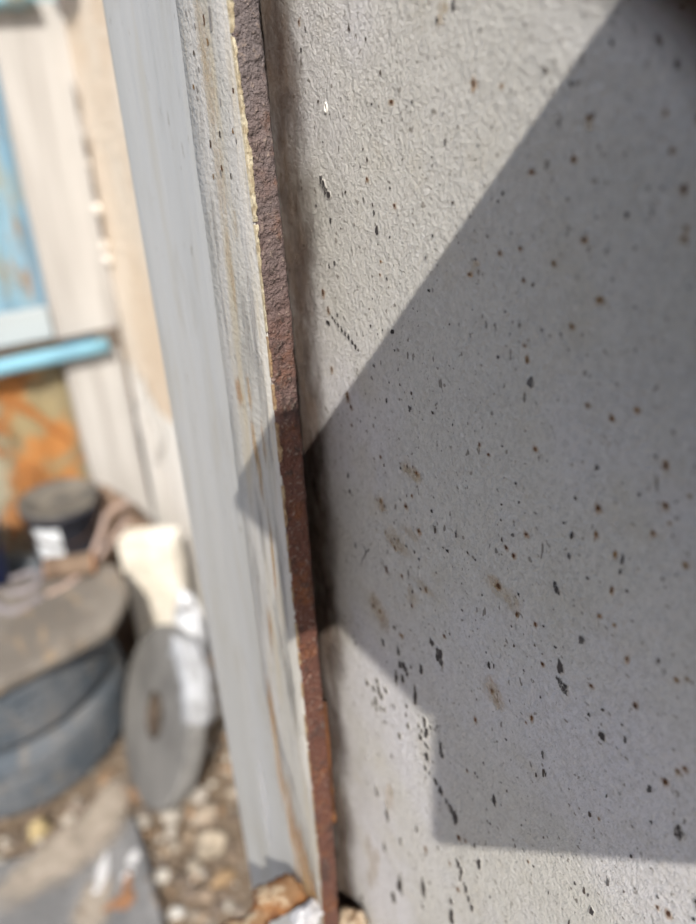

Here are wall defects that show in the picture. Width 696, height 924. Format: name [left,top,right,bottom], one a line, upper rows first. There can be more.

rust [259,0,355,916]